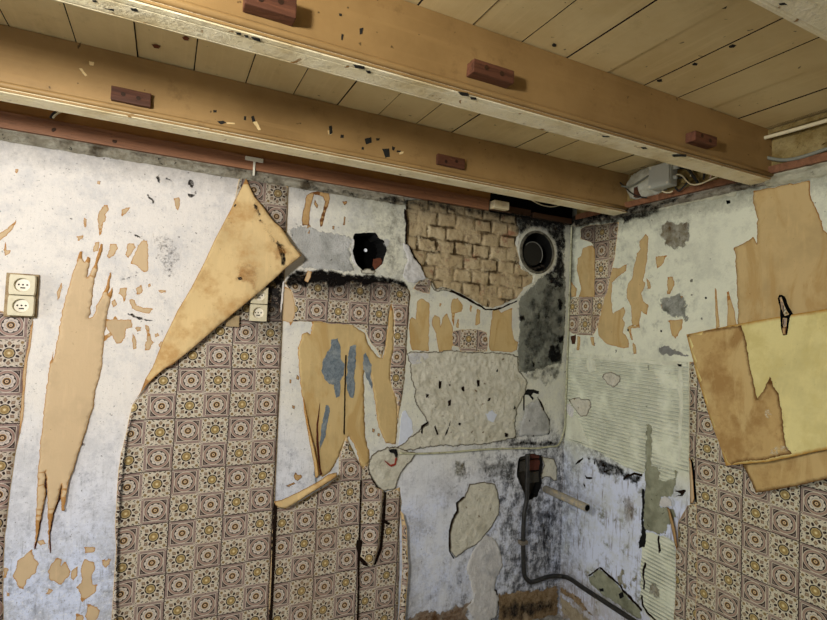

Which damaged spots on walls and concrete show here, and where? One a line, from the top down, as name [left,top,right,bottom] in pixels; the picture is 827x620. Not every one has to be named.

peeling [93,205,148,272]
peeling [104,179,301,404]
spalling [403,200,533,308]
damp [379,196,677,378]
spalling [659,293,688,322]
spalling [660,221,690,249]
peeling [274,397,337,509]
damp [594,458,641,483]
peeling [4,540,46,589]
peeling [46,547,111,620]
damp [537,513,550,560]
damp [497,584,593,620]